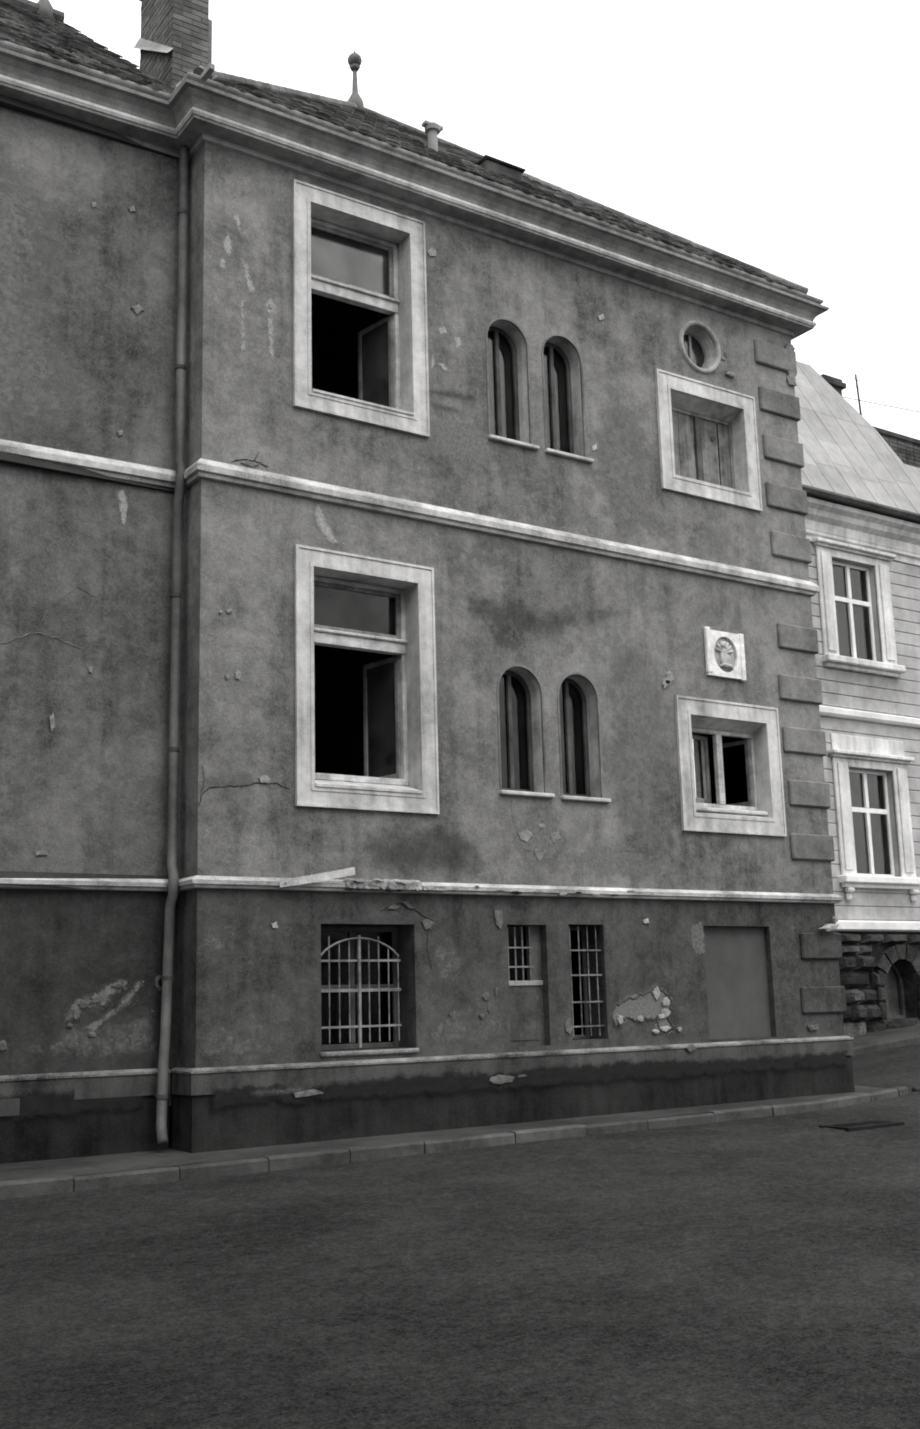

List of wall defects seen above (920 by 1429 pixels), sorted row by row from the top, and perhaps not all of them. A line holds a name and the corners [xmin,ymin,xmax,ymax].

crack [199,765,290,805]
spalling [345,878,522,895]
flaking render [34,975,162,1056]
spalling [610,983,697,1052]